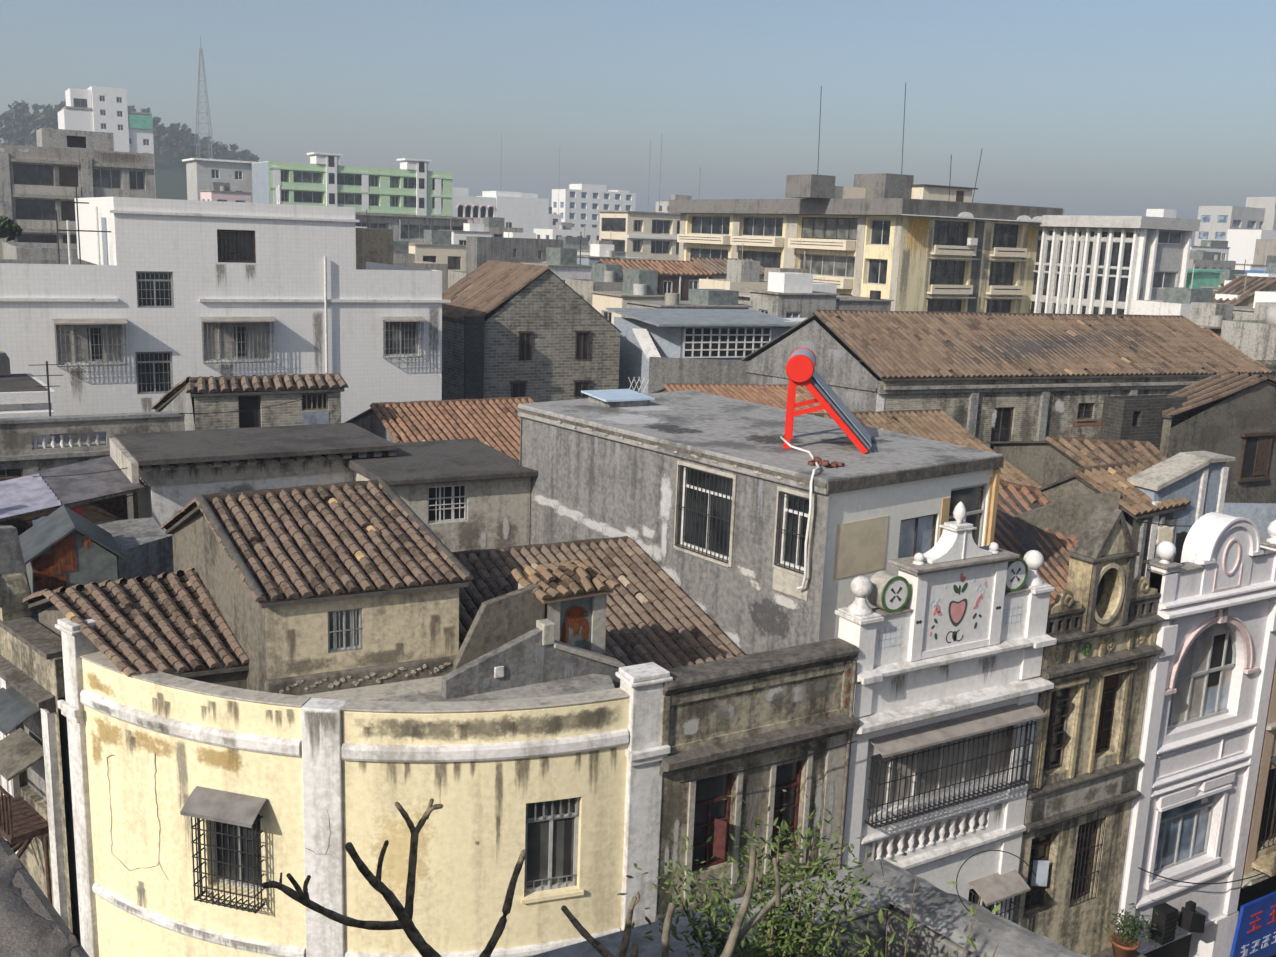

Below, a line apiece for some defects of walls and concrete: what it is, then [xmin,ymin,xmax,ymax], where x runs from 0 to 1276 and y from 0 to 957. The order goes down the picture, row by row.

leakage [900,200,1064,310]
leakage [383,708,611,738]
leakage [435,761,474,785]
leakage [516,757,548,781]
leakage [578,748,616,777]
crack [107,753,168,879]